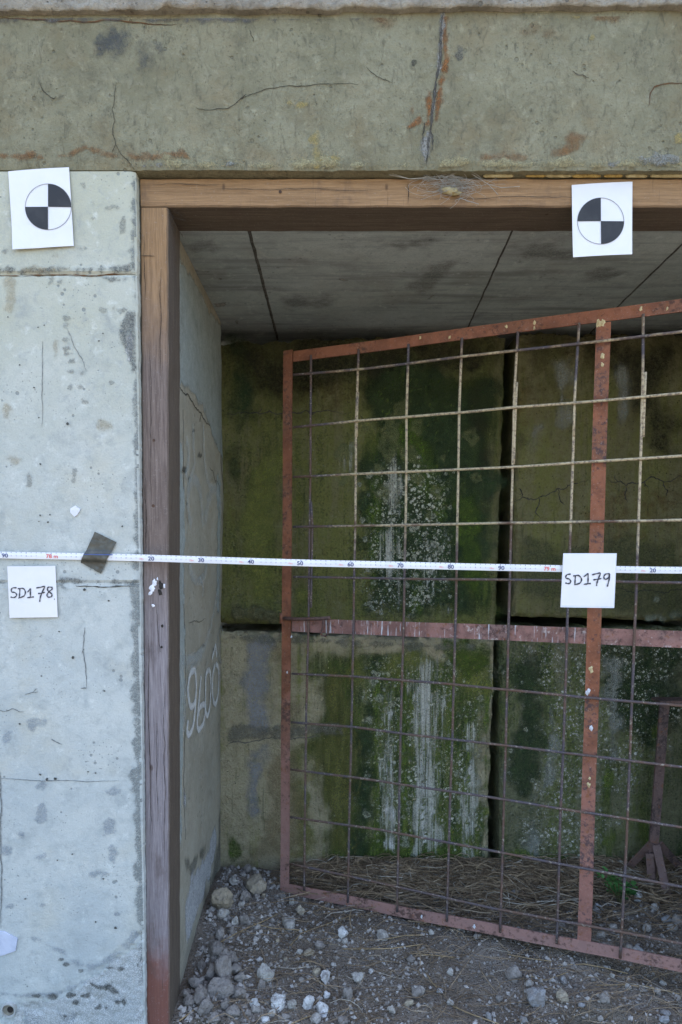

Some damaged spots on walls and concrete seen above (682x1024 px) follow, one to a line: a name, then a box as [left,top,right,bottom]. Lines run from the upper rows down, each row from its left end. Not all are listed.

crack [197,68,388,110]
corrosion [408,16,449,128]
crack [422,12,445,167]
leakage [380,527,400,577]
crack [515,475,682,517]
leakage [379,757,396,850]
leakage [407,659,446,858]
leakage [460,723,481,858]